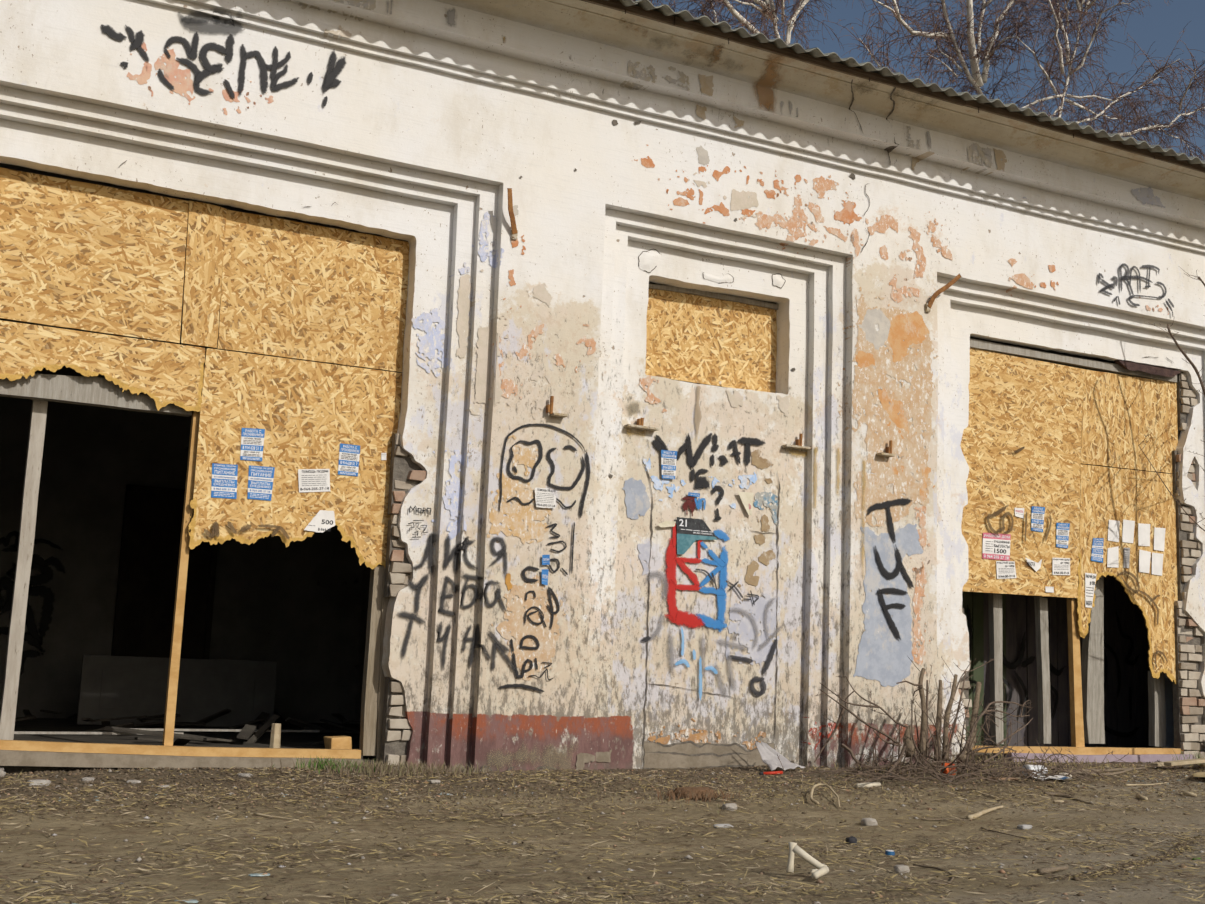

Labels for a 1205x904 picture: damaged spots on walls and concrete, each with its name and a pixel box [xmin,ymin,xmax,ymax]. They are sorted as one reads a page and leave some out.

peeling [1006,258,1059,300]
peeling [634,145,953,674]
spalling [1176,372,1198,431]
spalling [1169,450,1205,758]
spalling [380,677,412,769]